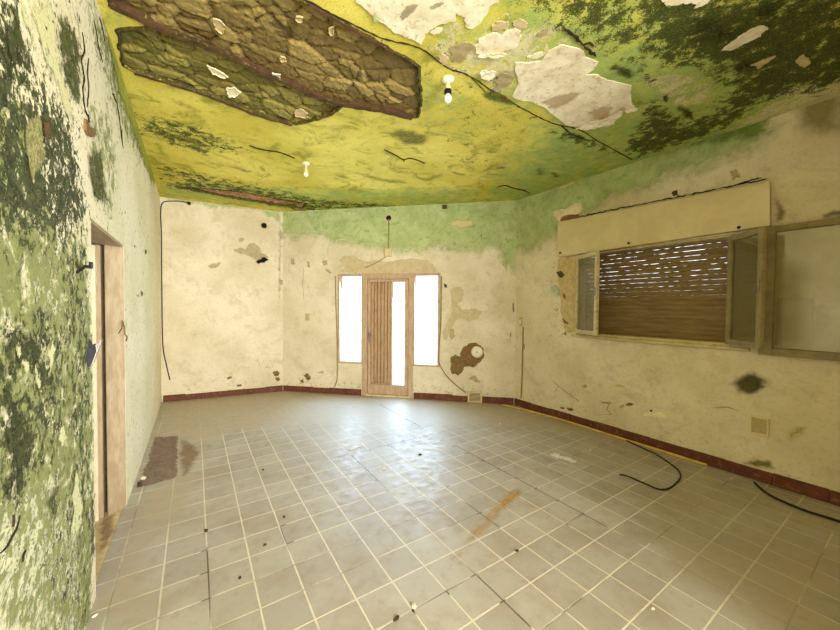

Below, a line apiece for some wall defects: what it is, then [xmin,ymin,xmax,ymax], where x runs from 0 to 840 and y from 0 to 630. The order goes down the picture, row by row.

mould [57,13,81,103]
crack [305,0,493,92]
peeling [356,0,499,45]
peeling [480,44,638,130]
crack [564,28,596,57]
peeling [722,25,768,51]
crack [510,101,632,160]
water stain [263,119,768,267]
crack [580,177,766,217]
spalling [450,343,484,383]
mould [2,378,34,512]
water stain [139,436,198,487]